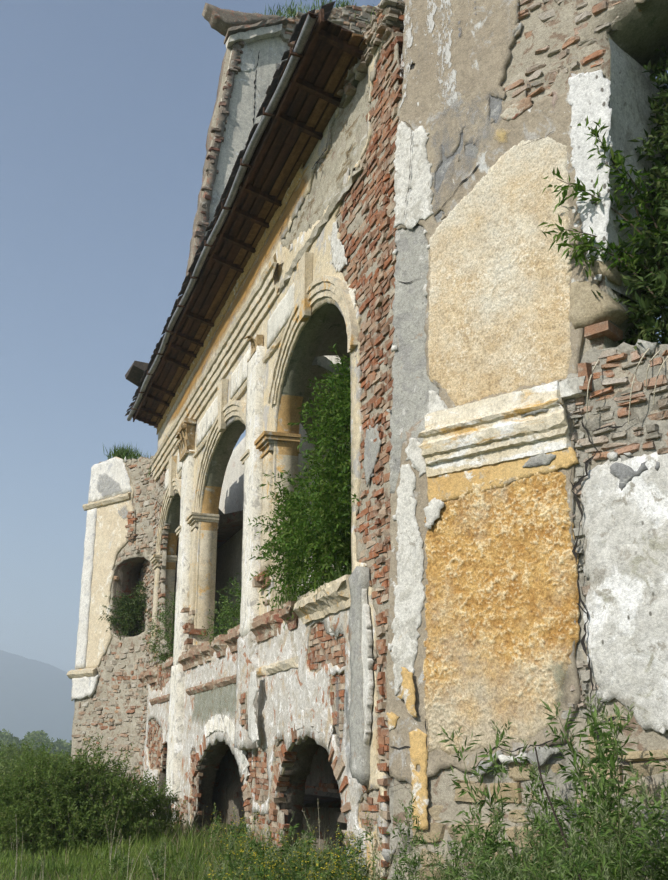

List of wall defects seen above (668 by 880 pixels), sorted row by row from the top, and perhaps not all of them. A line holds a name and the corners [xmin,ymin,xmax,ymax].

crack [252,51,260,125]
flaking render [71,456,172,800]
flaking render [281,0,668,880]
crack [570,407,635,741]